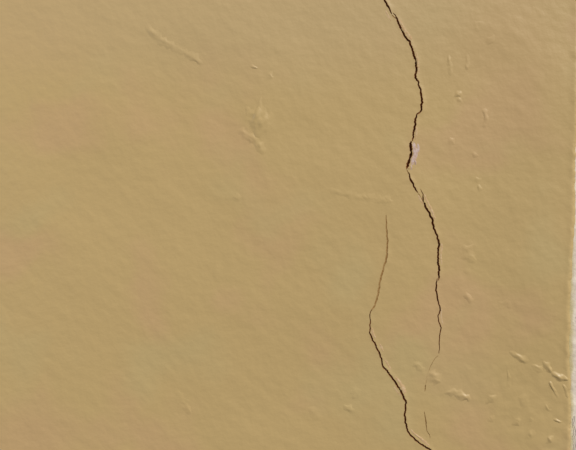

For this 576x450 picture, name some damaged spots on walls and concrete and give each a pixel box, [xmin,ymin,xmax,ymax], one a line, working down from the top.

crack [384,0,443,390]
flaking render [410,142,420,170]
crack [369,216,431,450]